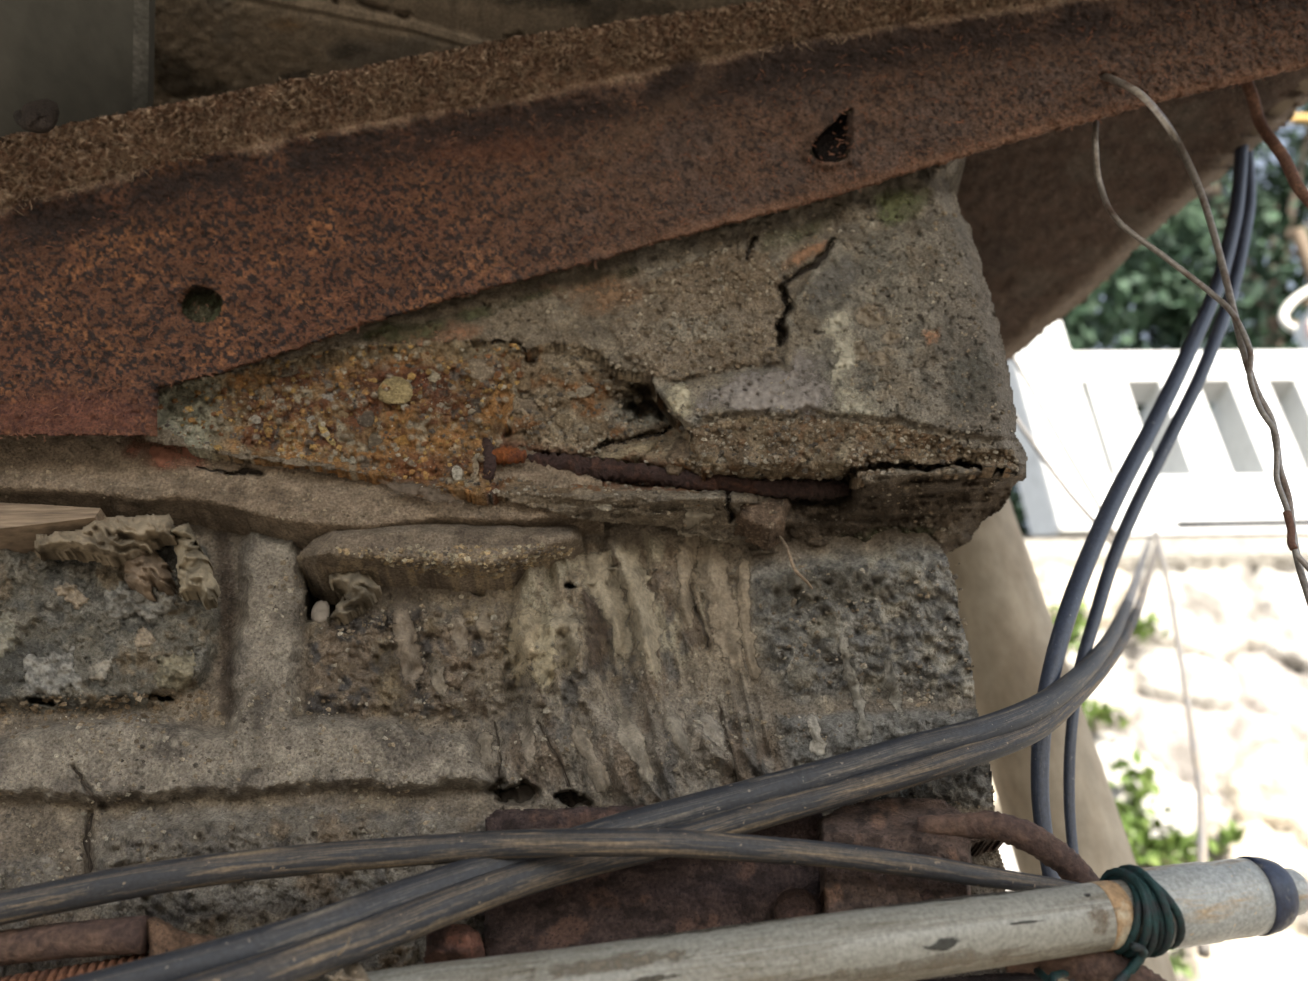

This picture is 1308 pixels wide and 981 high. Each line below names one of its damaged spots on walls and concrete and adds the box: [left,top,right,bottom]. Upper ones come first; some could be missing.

rust [552,275,642,312]
crack [745,236,757,260]
rust [783,241,826,268]
crack [775,239,835,347]
spalling [157,244,1024,551]
crack [847,461,1017,481]
peeling [0,612,113,697]
peeling [54,581,196,691]
crack [73,767,106,873]